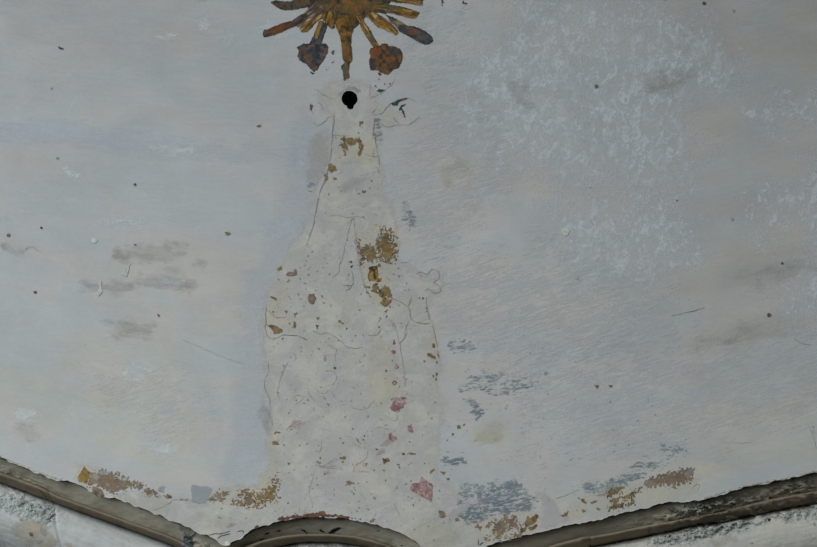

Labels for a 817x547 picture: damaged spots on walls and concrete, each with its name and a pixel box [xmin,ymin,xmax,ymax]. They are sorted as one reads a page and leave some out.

peeling [77,72,538,547]
crack [265,298,440,380]
peeling [574,460,817,547]